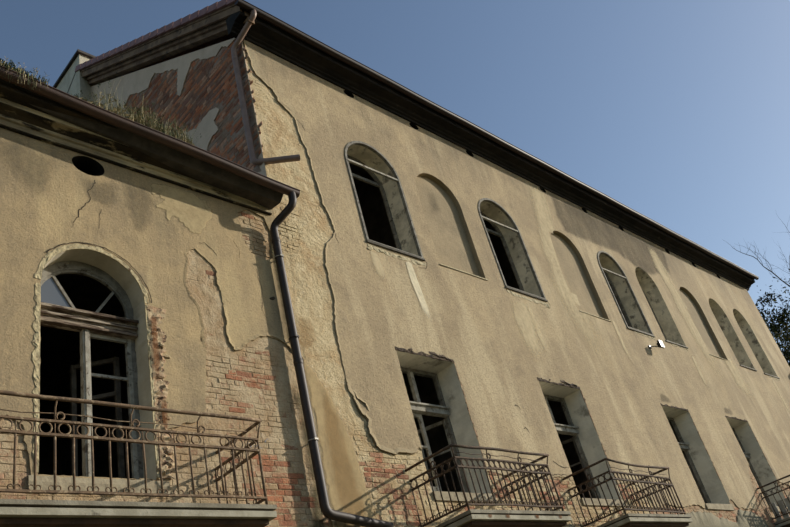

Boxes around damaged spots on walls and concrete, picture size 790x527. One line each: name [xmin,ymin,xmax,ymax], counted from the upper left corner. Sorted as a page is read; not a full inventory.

crack [73,180,102,229]
flaking render [0,242,331,527]
crack [243,41,338,241]
flaking render [126,40,790,527]